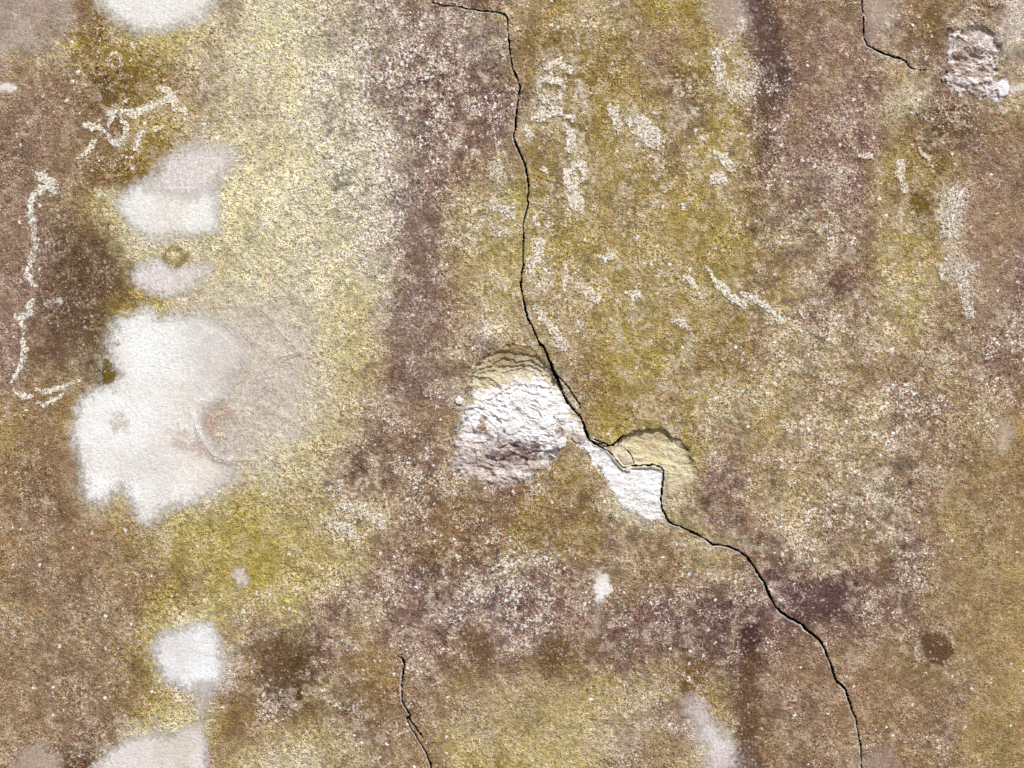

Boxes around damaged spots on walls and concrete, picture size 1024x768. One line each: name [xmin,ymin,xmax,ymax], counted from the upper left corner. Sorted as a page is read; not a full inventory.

crack [861,0,926,72]
spalling [941,24,1024,103]
leakage [162,244,190,268]
spalling [451,343,697,522]
crack [433,2,862,768]
crack [398,656,432,768]